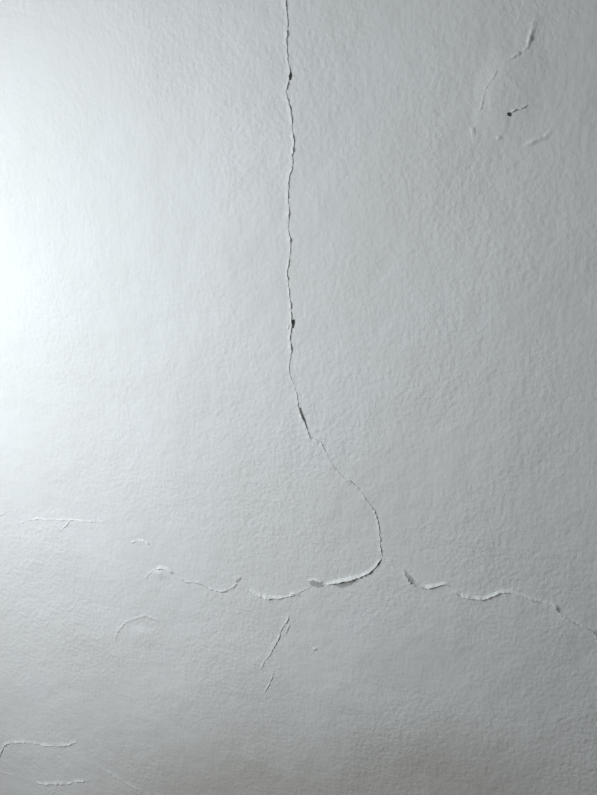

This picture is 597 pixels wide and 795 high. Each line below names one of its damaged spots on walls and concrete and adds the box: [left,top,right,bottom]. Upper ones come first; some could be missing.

crack [179,0,597,693]